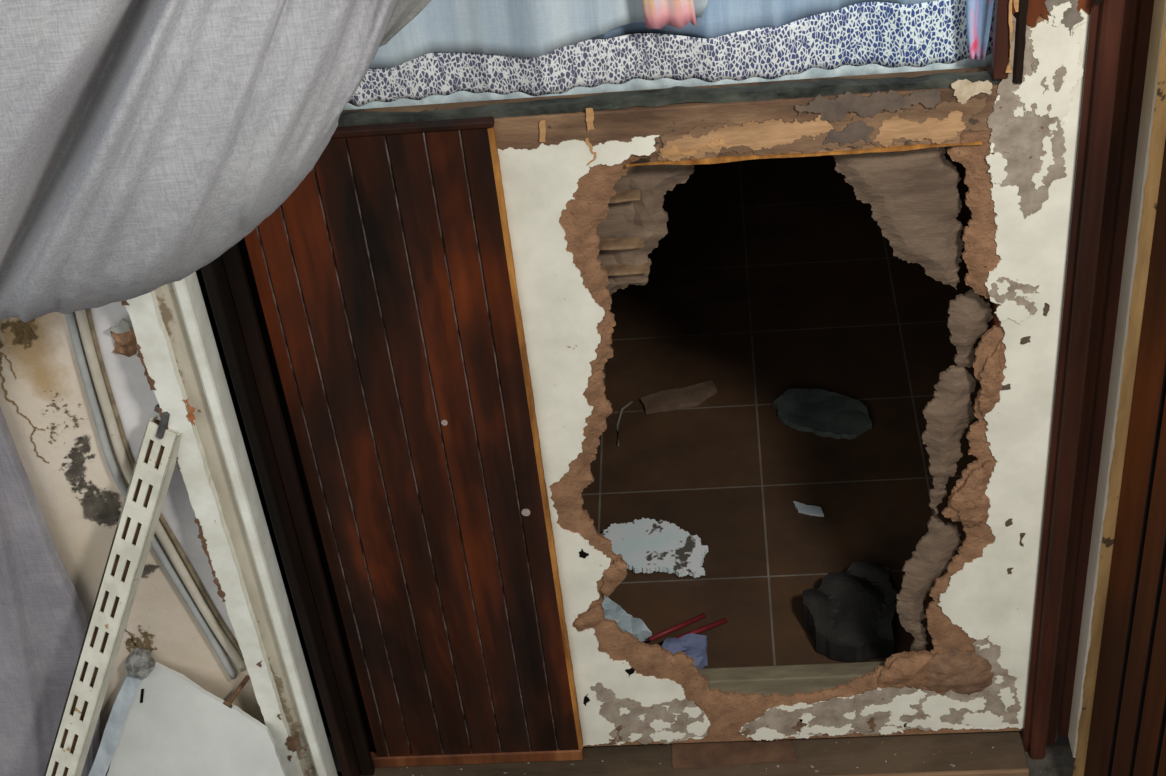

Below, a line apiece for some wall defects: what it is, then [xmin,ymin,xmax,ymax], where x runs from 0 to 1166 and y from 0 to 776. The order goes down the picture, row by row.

peeling [986,0,1086,219]
peeling [994,280,1050,345]
crack [0,352,49,463]
peeling [583,682,708,745]
peeling [738,636,1022,741]